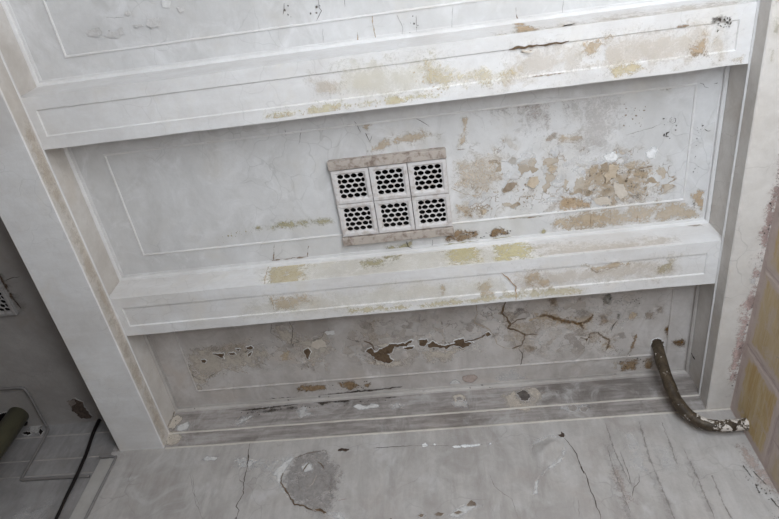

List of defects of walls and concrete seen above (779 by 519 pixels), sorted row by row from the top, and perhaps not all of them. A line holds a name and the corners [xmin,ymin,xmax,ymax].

leakage [515,15,537,33]
peeling [509,41,569,53]
peeling [454,140,595,216]
leakage [758,184,779,261]
leakage [264,246,309,284]
leakage [359,241,412,265]
leakage [445,228,533,262]
spalling [347,331,492,368]
spalling [67,397,93,419]
crack [235,444,255,519]
spalling [261,450,344,519]
crack [558,431,601,519]